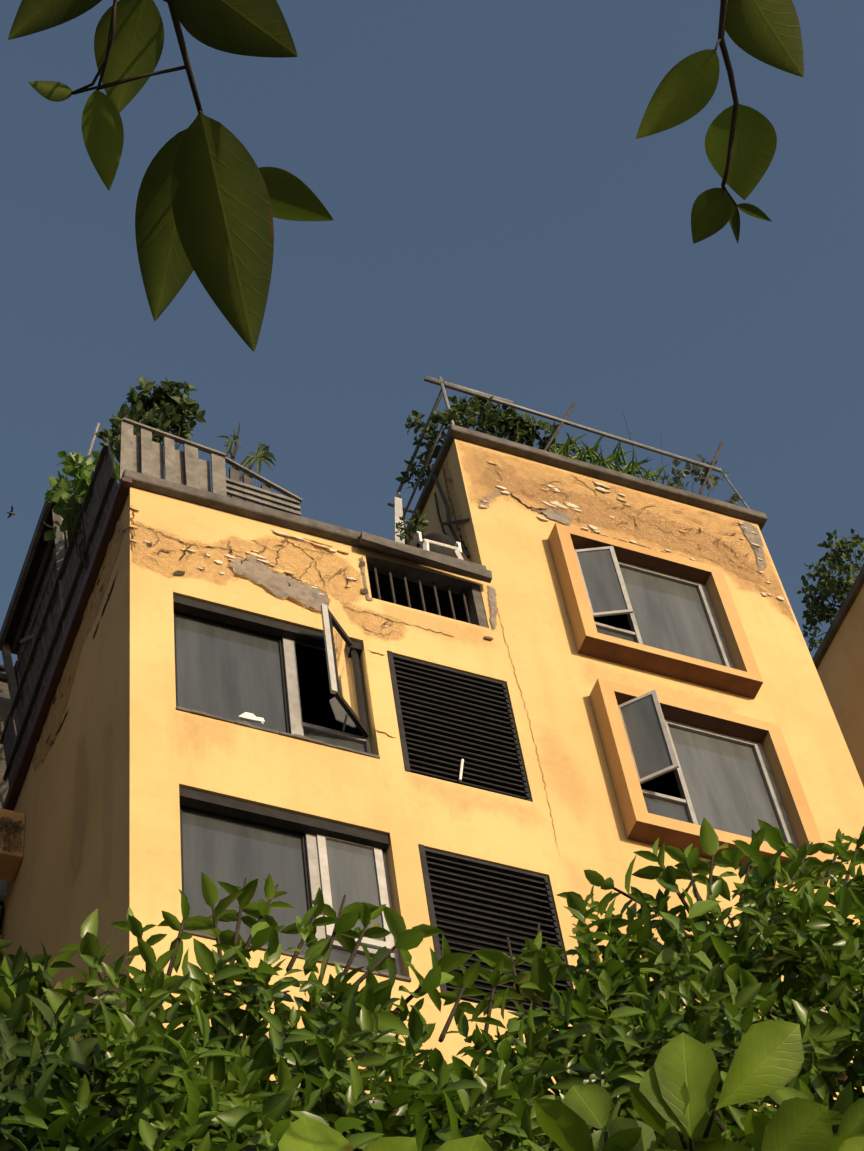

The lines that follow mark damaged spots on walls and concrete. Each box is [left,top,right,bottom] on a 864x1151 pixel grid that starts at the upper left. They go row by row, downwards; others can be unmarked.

crack [80,507,349,638]
spalling [479,479,511,509]
spalling [536,500,582,526]
spalling [739,521,784,601]
peeling [32,520,373,770]
crack [34,654,72,763]